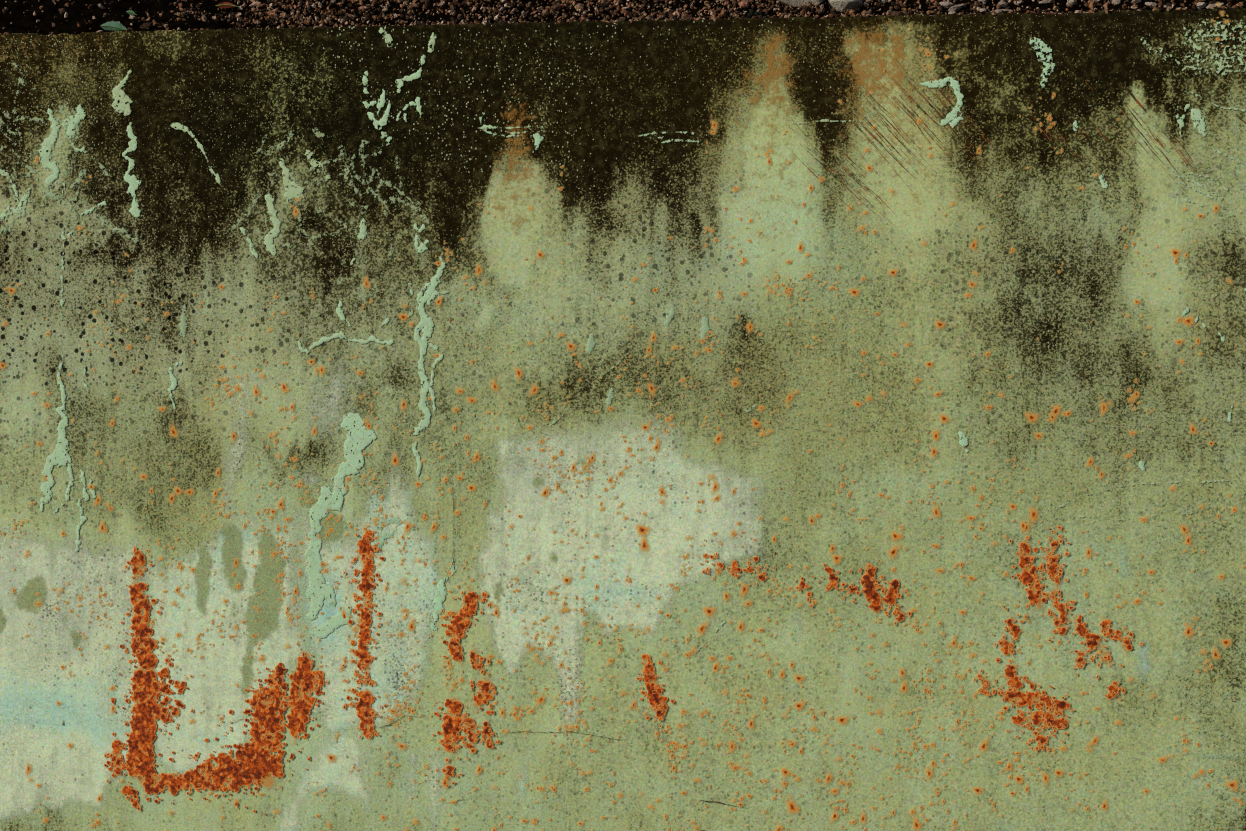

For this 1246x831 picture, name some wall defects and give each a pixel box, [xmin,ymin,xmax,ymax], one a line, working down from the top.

peeling [40,352,96,552]
peeling [0,63,142,320]
peeling [170,123,221,185]
water stain [308,375,352,431]
peeling [229,129,449,477]
peeling [304,412,377,638]
peeling [395,32,436,93]
corrosion [31,281,1162,831]
corrosion [693,207,775,265]